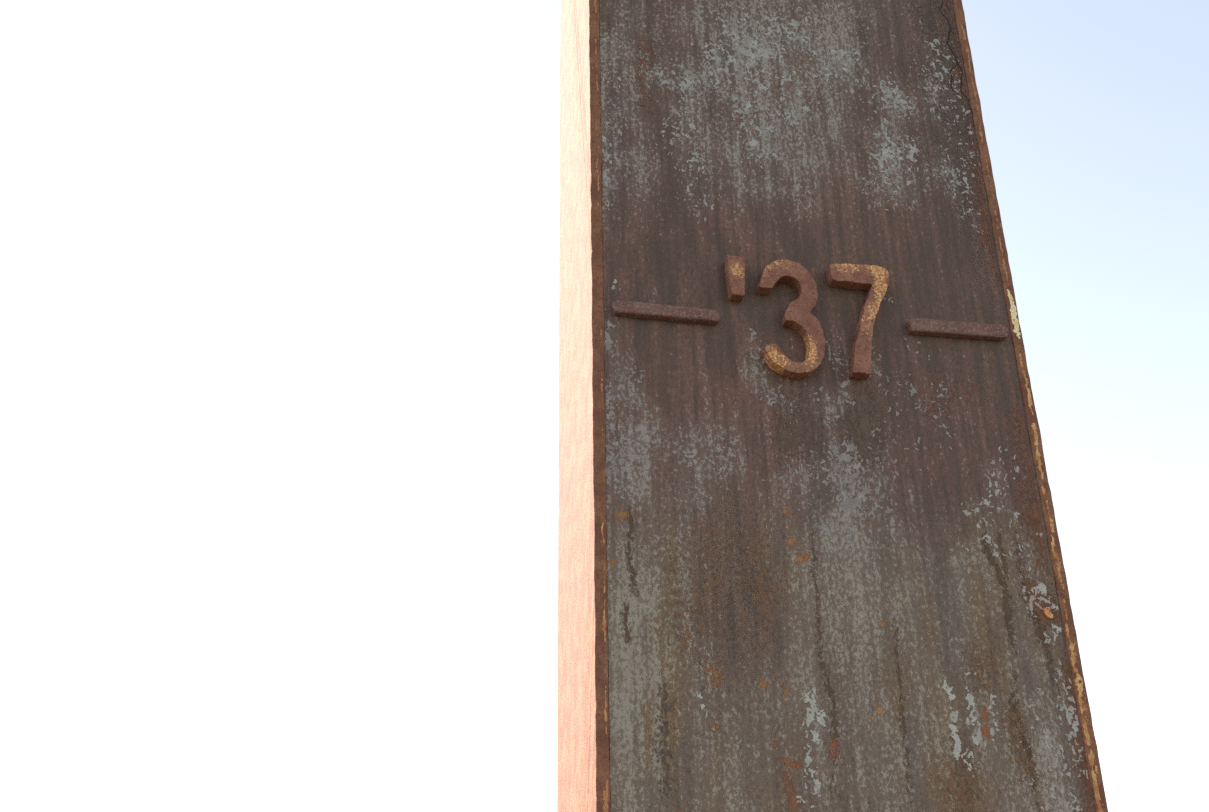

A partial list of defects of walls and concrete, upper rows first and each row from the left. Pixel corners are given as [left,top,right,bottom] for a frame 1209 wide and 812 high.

peeling [648,0,1021,339]
peeling [736,328,795,414]
peeling [798,330,975,544]
rust [610,505,639,643]
peeling [796,688,826,808]
rust [787,532,839,779]
rust [879,620,913,803]
peeling [938,672,1000,777]
rust [934,645,1039,812]
peeling [961,354,1103,812]
rust [981,402,1095,812]